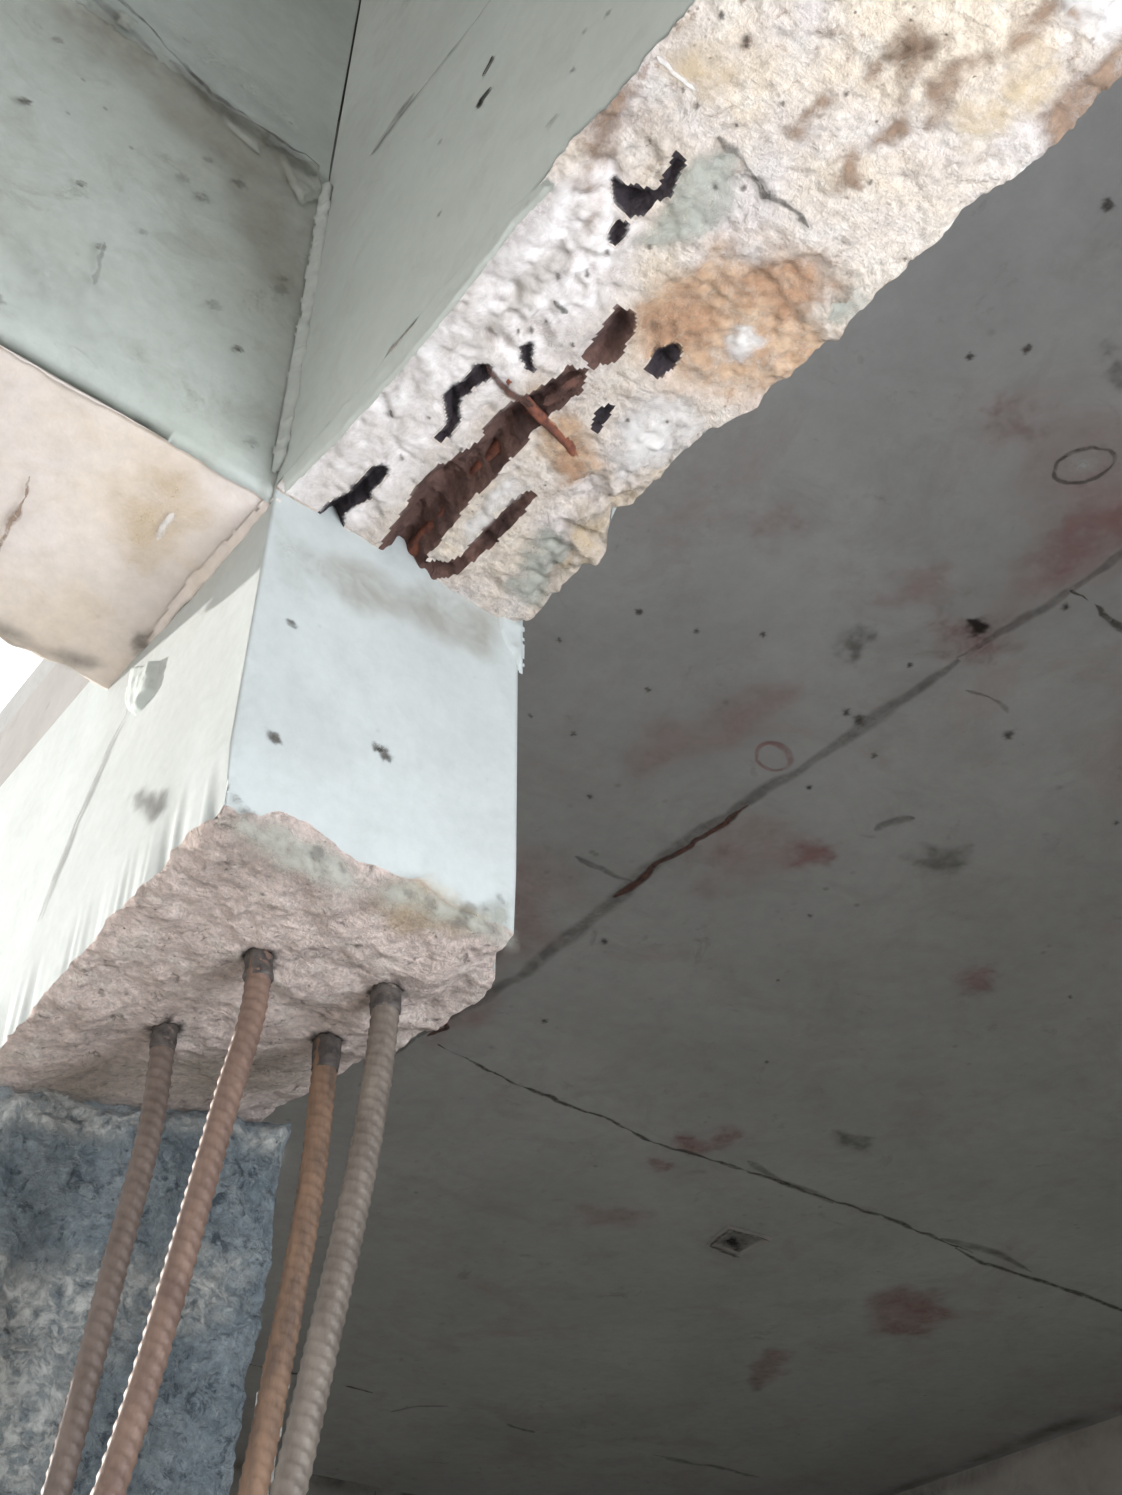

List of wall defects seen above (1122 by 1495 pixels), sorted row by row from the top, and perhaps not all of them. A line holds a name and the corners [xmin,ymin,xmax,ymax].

spalling [143,150,736,650]
crack [486,365,583,407]
corrosion [543,416,599,483]
crack [0,476,30,547]
spalling [498,617,525,674]
crack [1070,590,1122,630]
crack [613,805,748,898]
spalling [0,805,513,1122]
crack [427,1023,1122,1311]